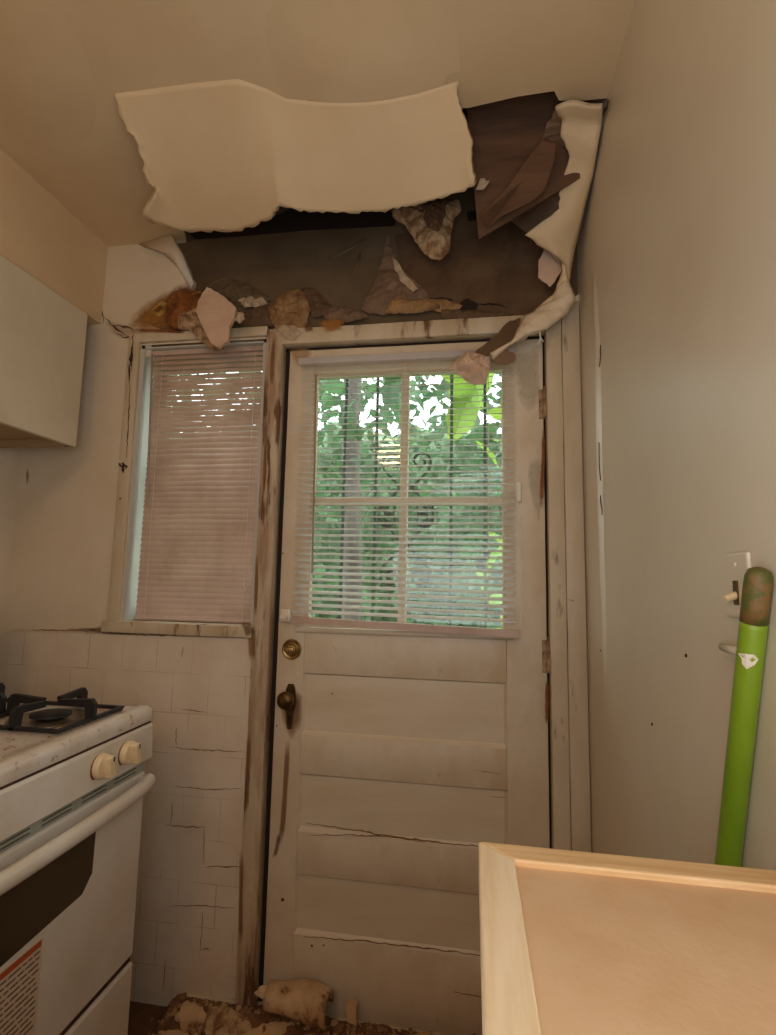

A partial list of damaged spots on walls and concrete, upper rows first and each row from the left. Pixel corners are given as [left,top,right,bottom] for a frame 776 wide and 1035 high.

spalling [138,235,195,290]
crack [175,709,243,752]
crack [170,786,239,868]
crack [179,905,231,950]